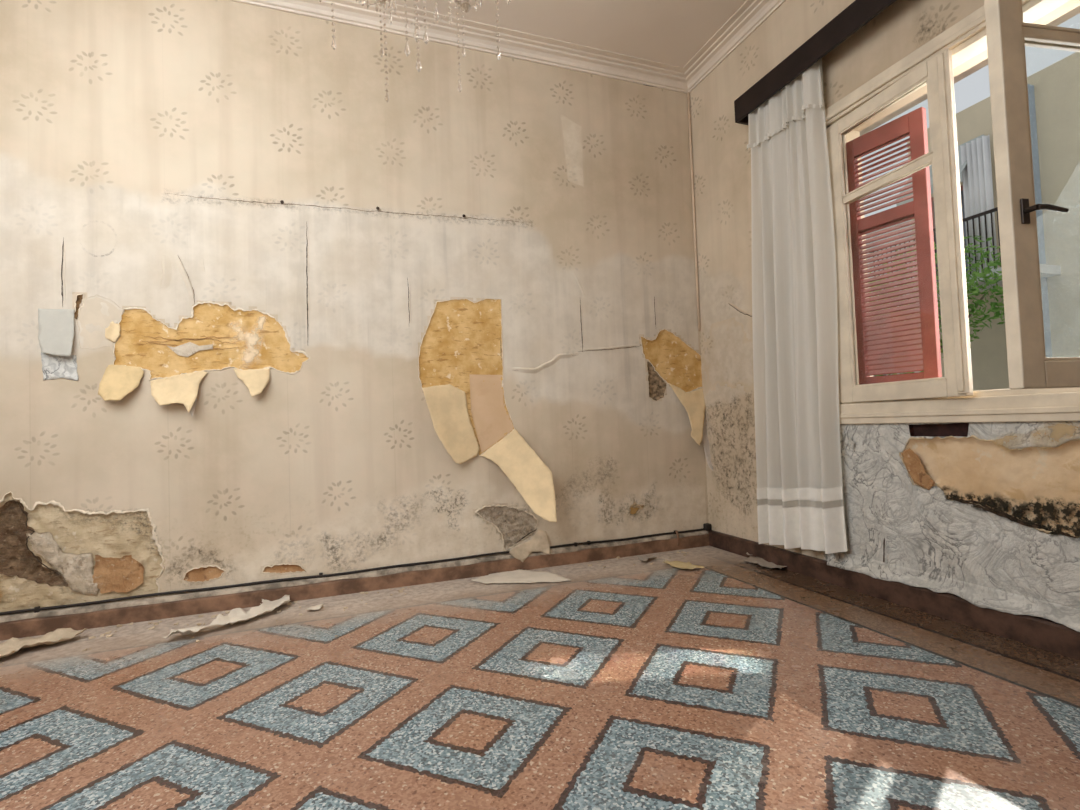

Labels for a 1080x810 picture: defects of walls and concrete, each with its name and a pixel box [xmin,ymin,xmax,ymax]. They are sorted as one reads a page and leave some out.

crack [59,237,67,307]
crack [304,227,312,340]
damp [0,146,754,506]
flaking render [647,361,666,401]
flaking render [0,491,165,612]
damp [171,472,706,591]
flaking render [475,504,550,562]
flaking render [899,435,1080,538]